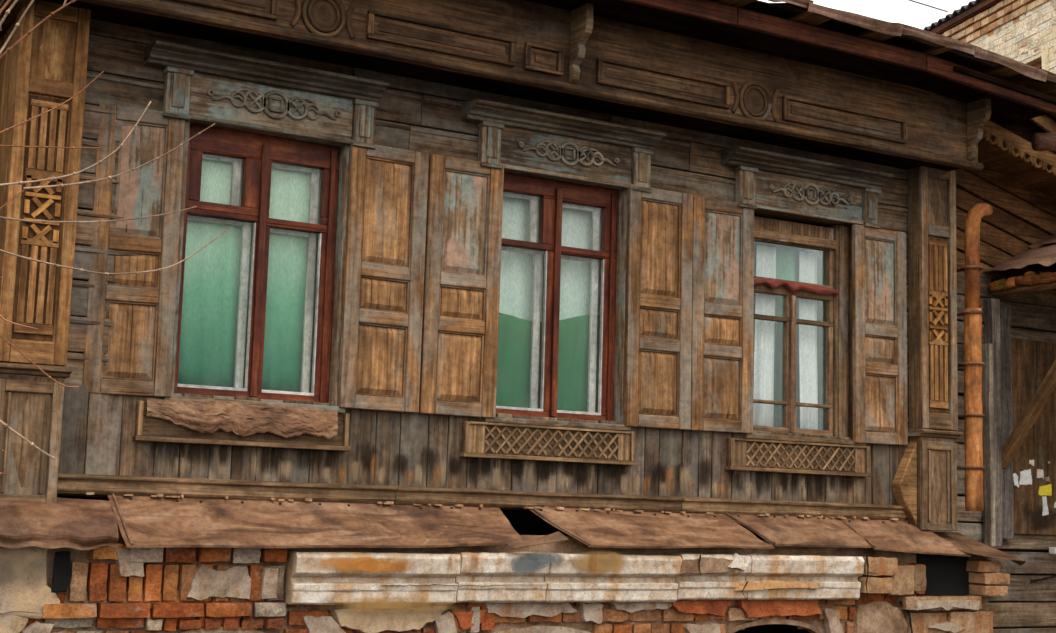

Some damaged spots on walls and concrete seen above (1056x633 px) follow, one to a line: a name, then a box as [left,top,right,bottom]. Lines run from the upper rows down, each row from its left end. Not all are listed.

spalling [115,548,144,577]
spalling [187,564,278,601]
flaking render [303,553,844,633]